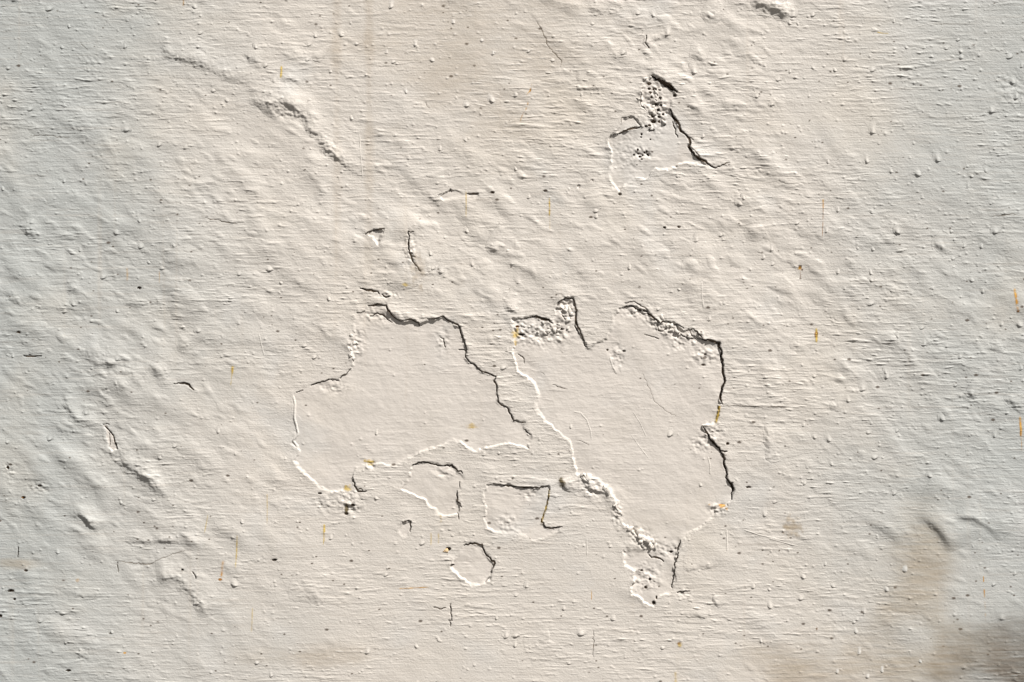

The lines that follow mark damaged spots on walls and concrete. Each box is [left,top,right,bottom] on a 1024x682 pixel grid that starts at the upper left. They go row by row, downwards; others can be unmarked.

crack [613,76,729,168]
crack [361,288,529,434]
crack [526,297,585,346]
crack [625,302,785,408]
crack [497,484,557,529]
crack [703,427,734,496]